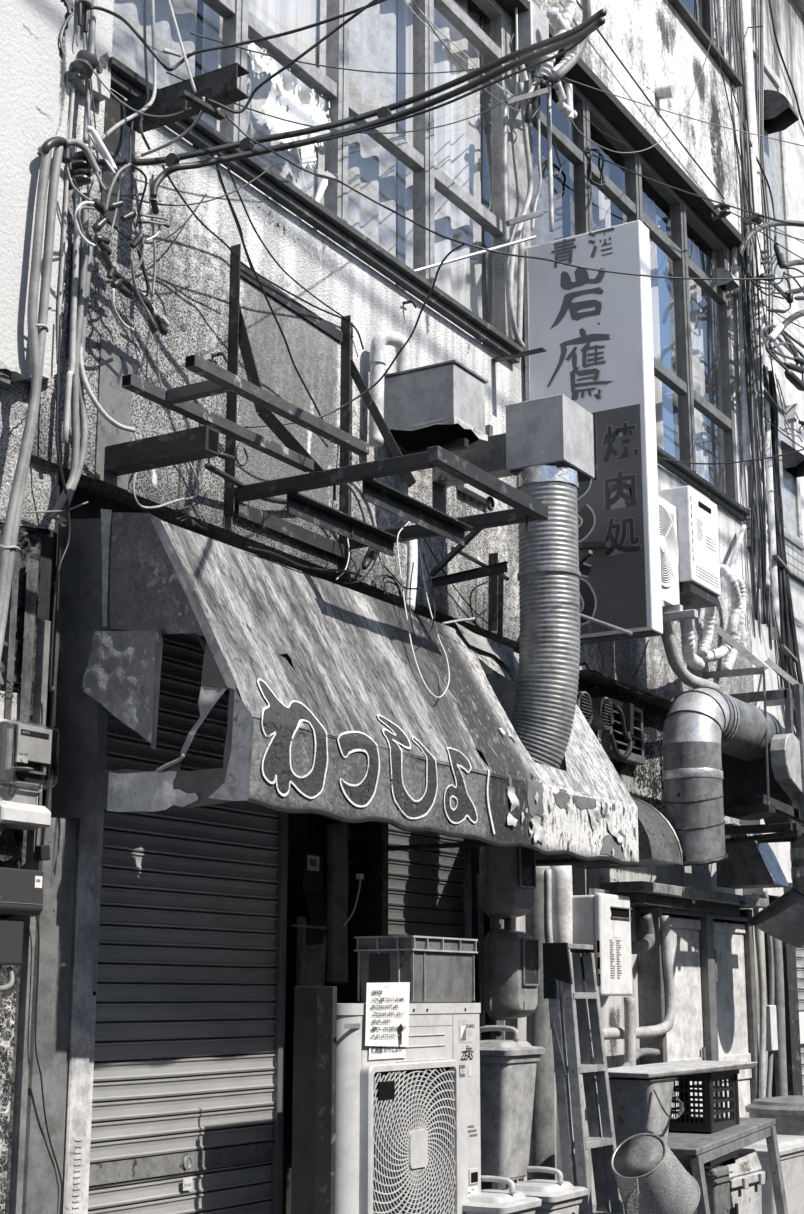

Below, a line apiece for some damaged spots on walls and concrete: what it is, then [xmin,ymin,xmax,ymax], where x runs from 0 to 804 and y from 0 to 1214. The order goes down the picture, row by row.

leakage [657,10,675,55]
leakage [668,56,725,203]
peeling [507,772,636,859]